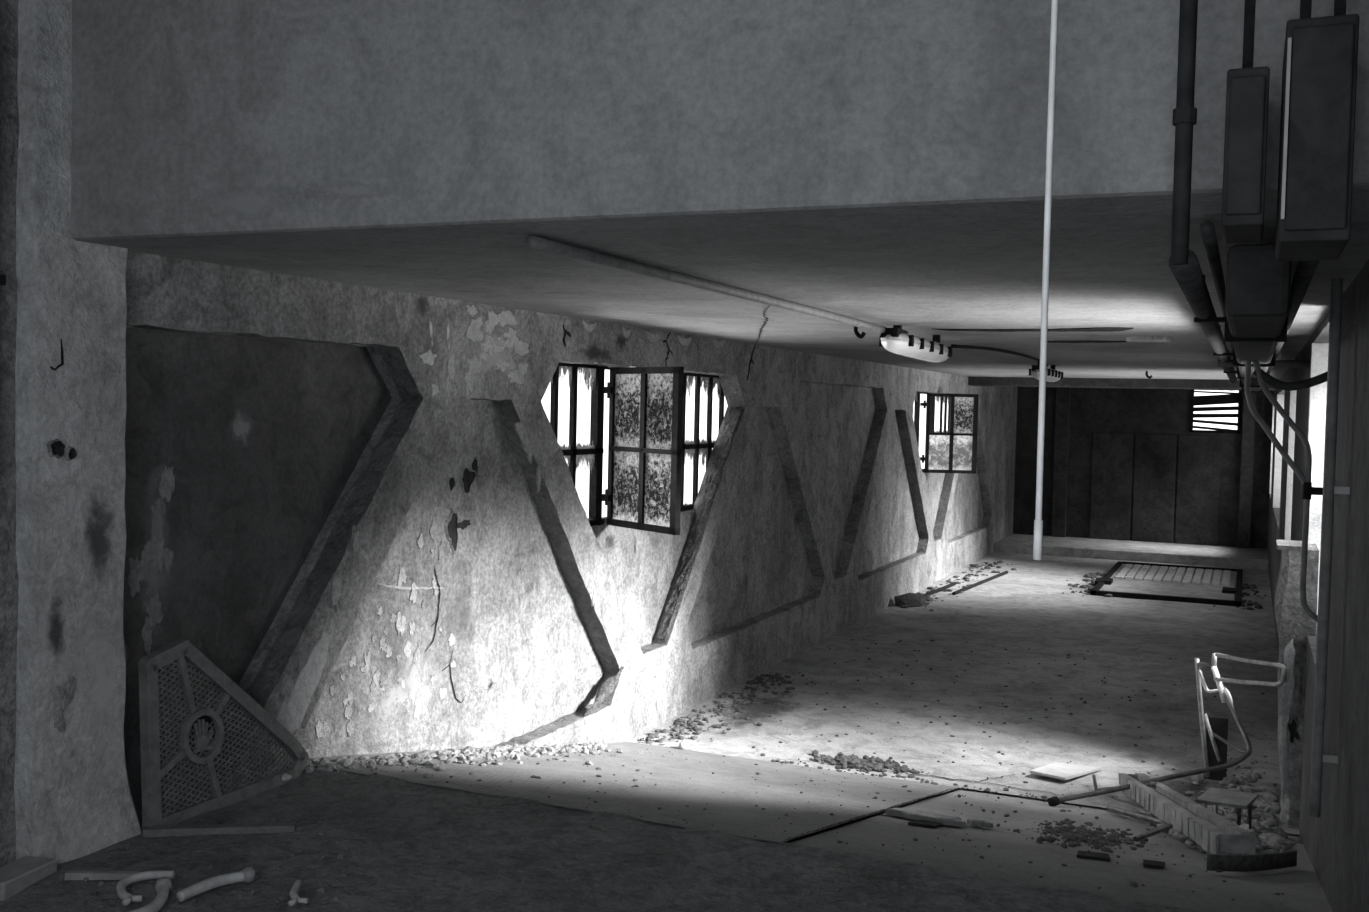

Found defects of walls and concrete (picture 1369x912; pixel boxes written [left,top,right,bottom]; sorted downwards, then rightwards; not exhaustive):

peeling [418,305,529,397]
crack [746,305,779,380]
flaking render [249,458,478,767]